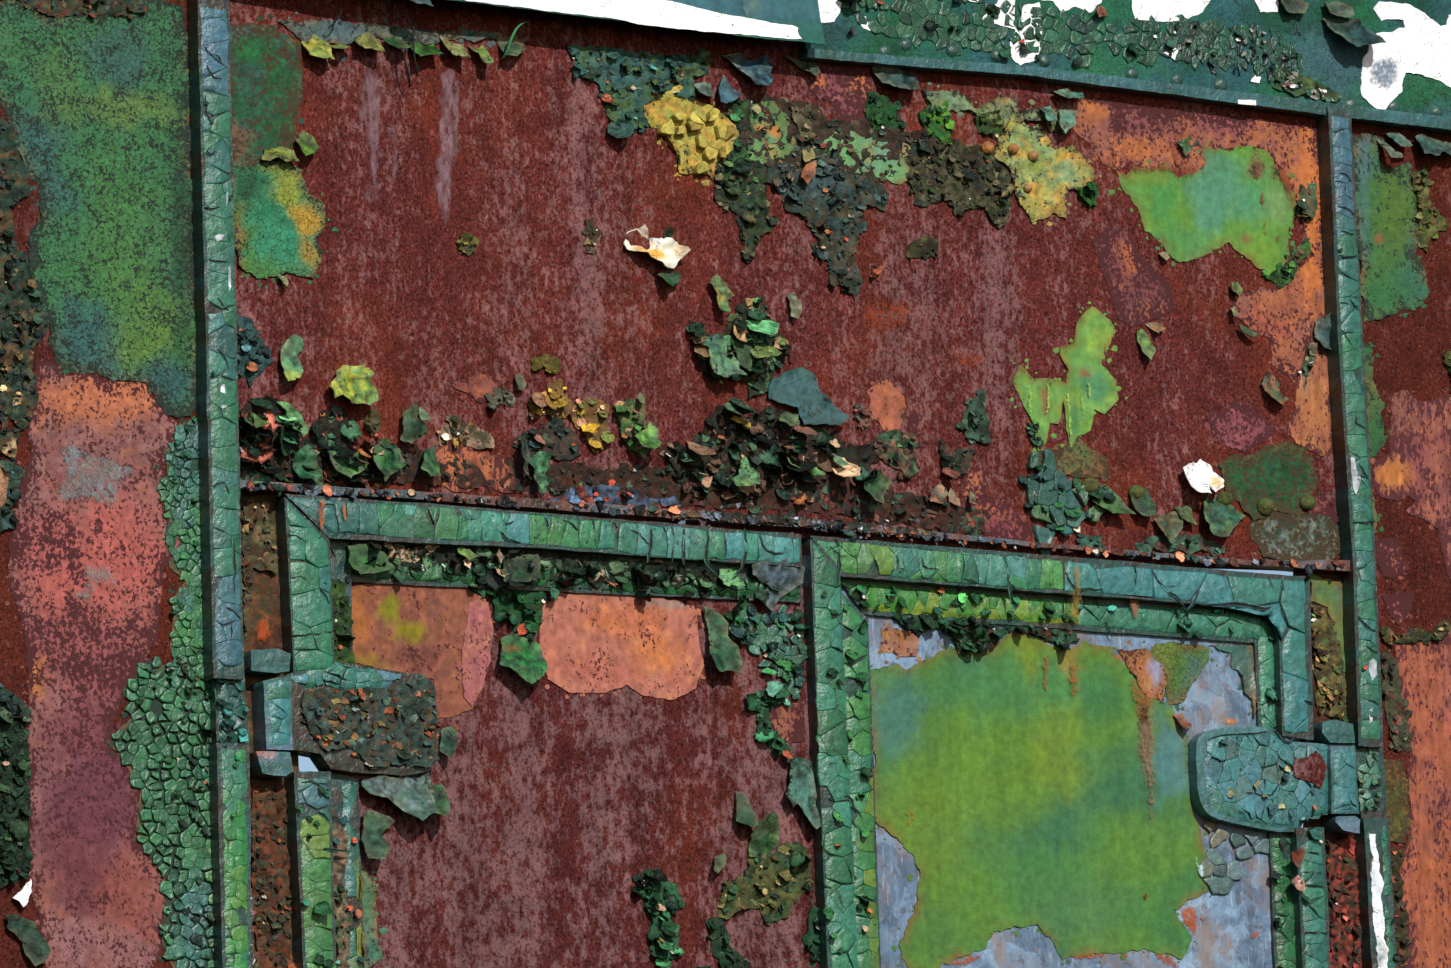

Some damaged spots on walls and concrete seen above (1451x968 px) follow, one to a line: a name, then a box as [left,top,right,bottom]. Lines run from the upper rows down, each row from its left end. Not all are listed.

peeling [215,11,527,291]
peeling [465,0,1319,300]
peeling [1254,0,1451,109]
peeling [1352,131,1451,322]
peeling [0,0,213,968]
crack [111,7,249,968]
peeling [220,274,1348,722]
crack [267,108,1394,968]
peeling [251,784,297,968]
peeling [300,678,458,968]
peeling [870,612,1256,968]
peeling [1325,618,1451,968]